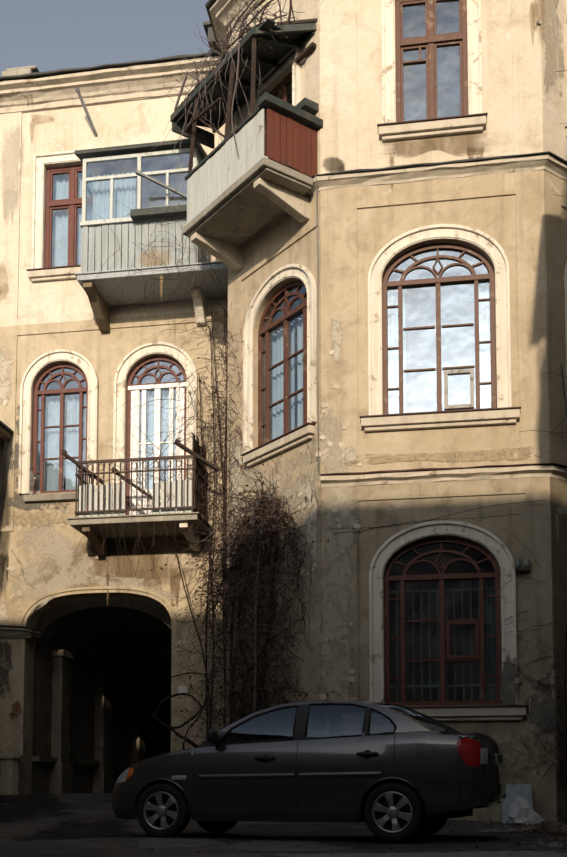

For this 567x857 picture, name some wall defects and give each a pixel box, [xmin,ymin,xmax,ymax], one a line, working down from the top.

leakage [0,460,180,611]
flaking render [297,410,552,574]
flaking render [0,642,13,700]